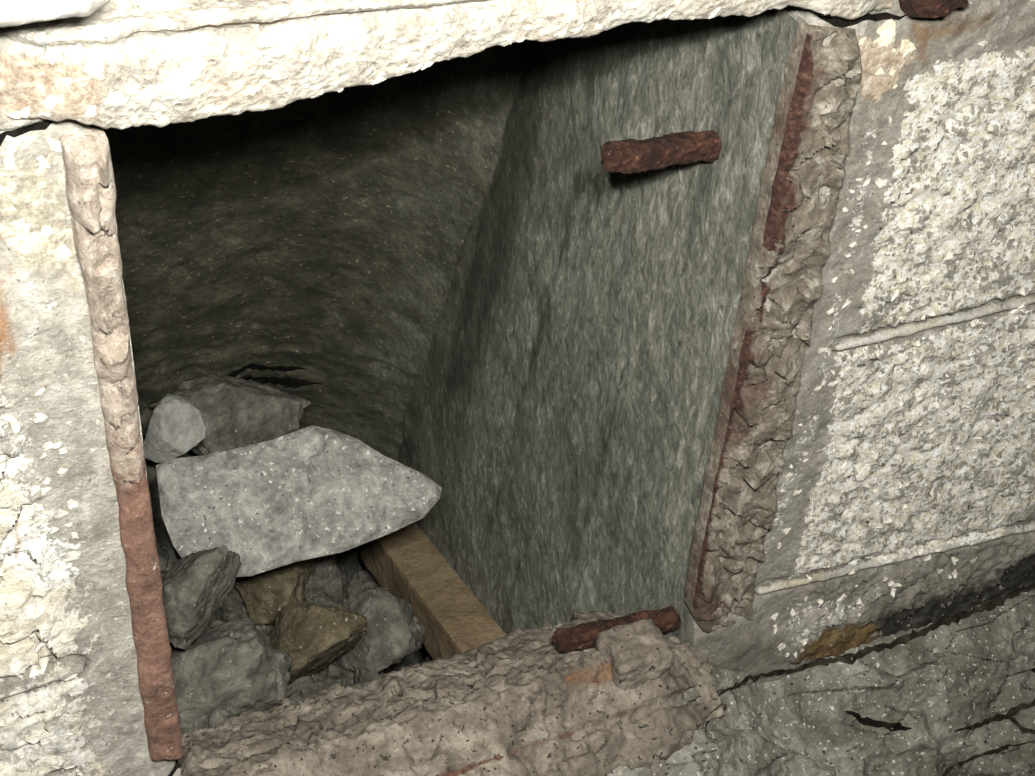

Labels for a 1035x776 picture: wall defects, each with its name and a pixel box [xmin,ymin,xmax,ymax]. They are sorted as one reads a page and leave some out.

rust [693,33,813,608]
crack [718,584,1035,696]
water stain [795,553,1035,663]
crack [846,711,912,731]
crack [942,699,1035,776]